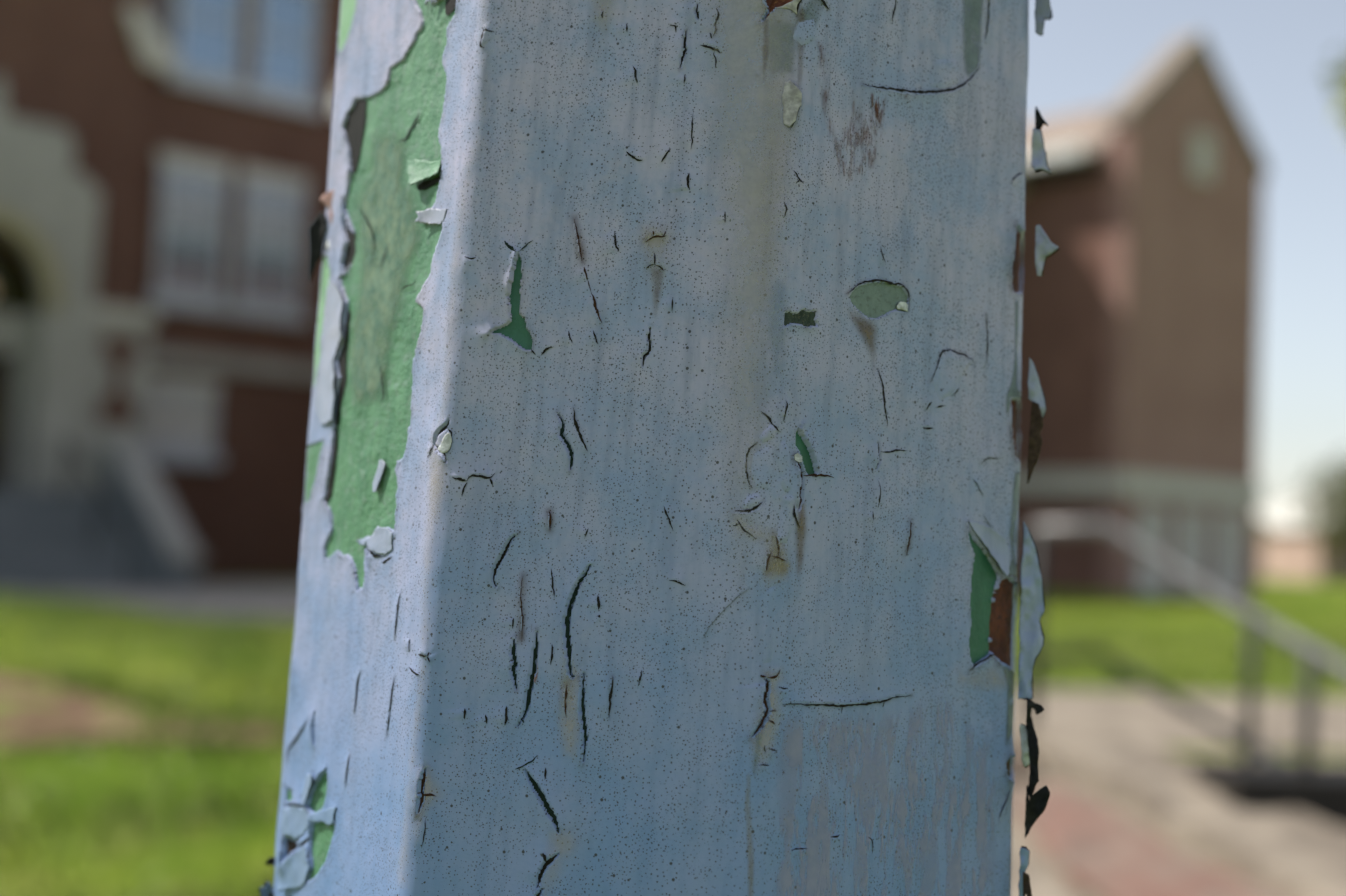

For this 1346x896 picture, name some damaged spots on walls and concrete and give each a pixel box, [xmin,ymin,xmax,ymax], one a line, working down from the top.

rust [765,0,793,19]
crack [862,0,990,94]
peeling [305,0,456,588]
peeling [492,257,533,350]
crack [614,231,673,365]
peeling [1035,225,1060,276]
crack [463,529,642,762]
rust [989,577,1015,671]
crack [753,671,912,766]
peeling [968,521,1050,896]
peeling [259,772,337,896]
crack [516,757,559,896]